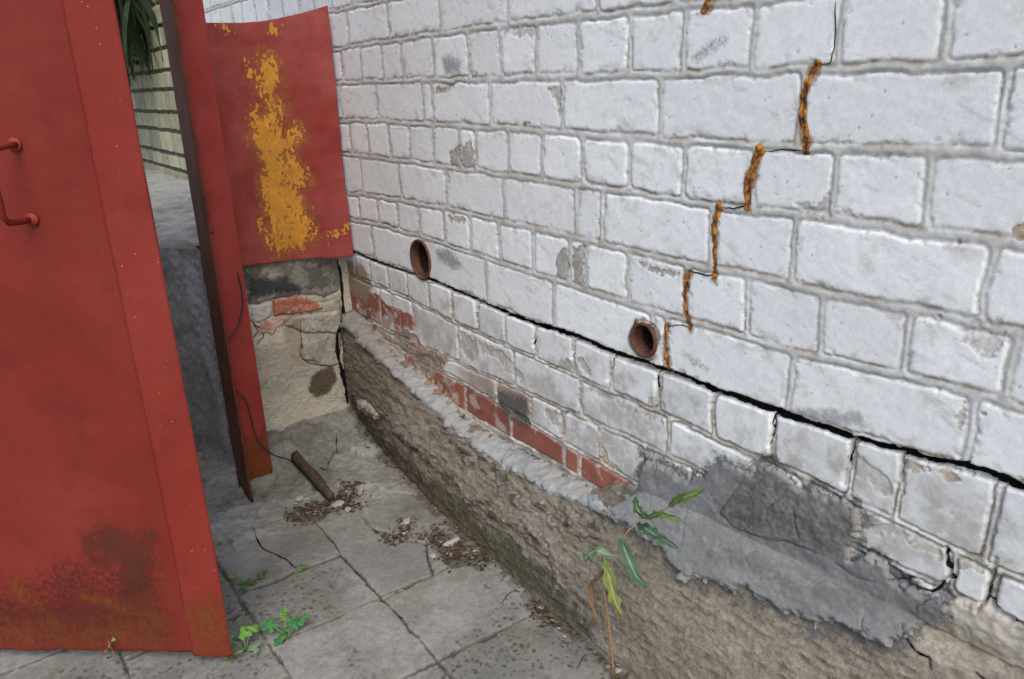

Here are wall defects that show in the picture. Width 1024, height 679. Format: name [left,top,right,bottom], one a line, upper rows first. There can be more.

crack [300,0,1024,490]
damp [308,366,337,397]
spalling [460,332,523,384]
spalling [558,357,666,425]